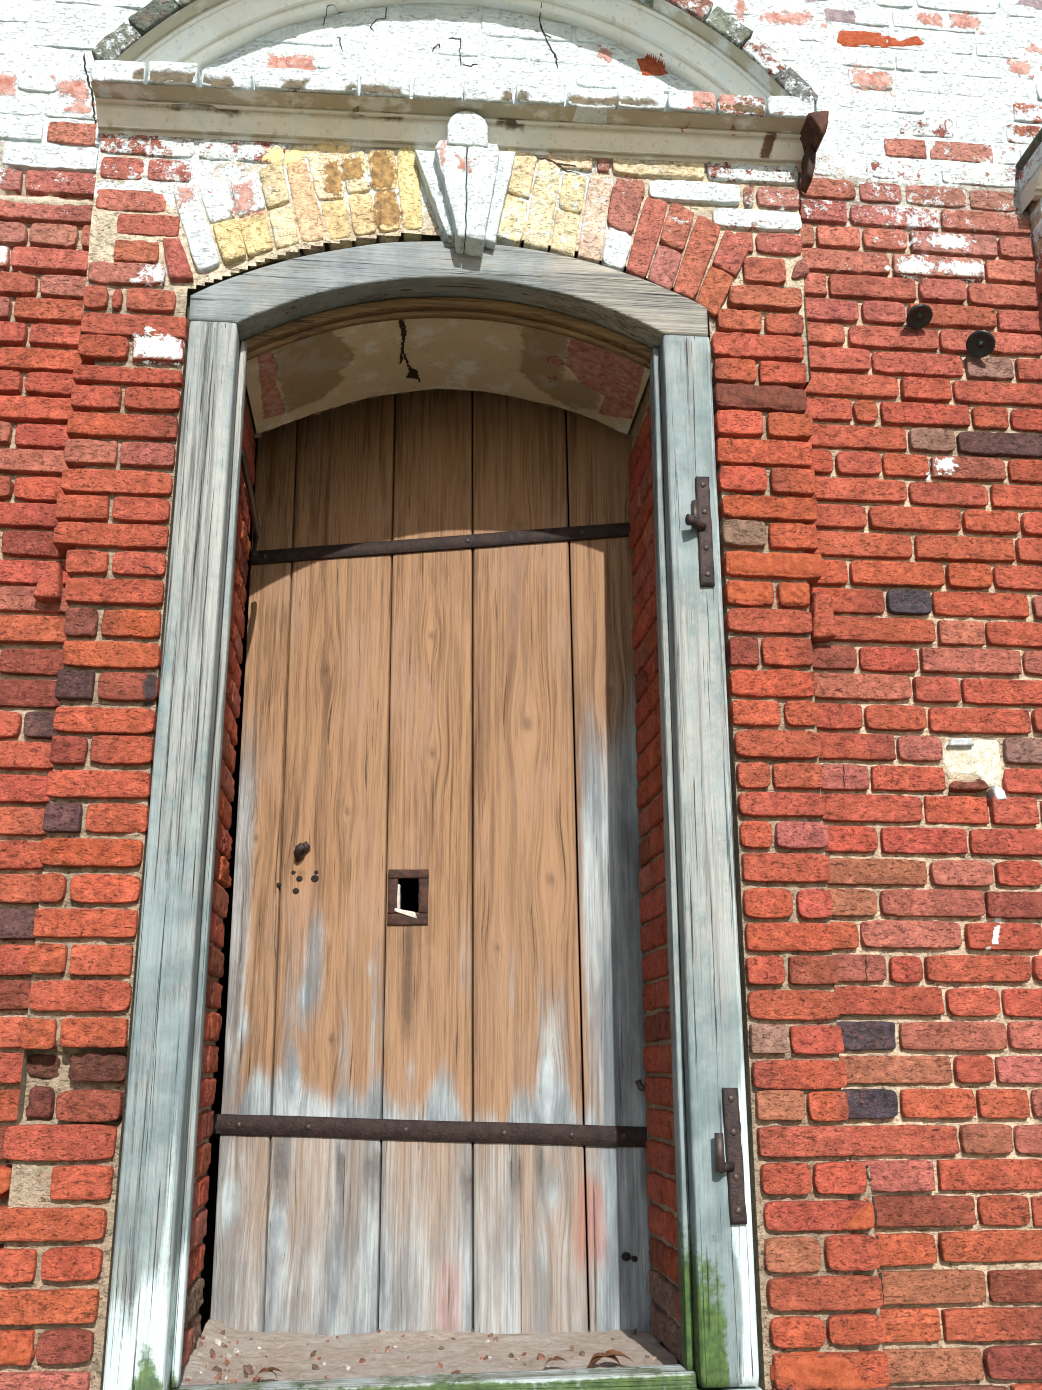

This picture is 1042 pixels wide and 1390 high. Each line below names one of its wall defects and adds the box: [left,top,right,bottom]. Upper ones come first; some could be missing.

crack [539,2,558,68]
spalling [733,0,984,97]
peeling [0,72,17,96]
peeling [50,75,96,116]
crack [399,320,420,383]